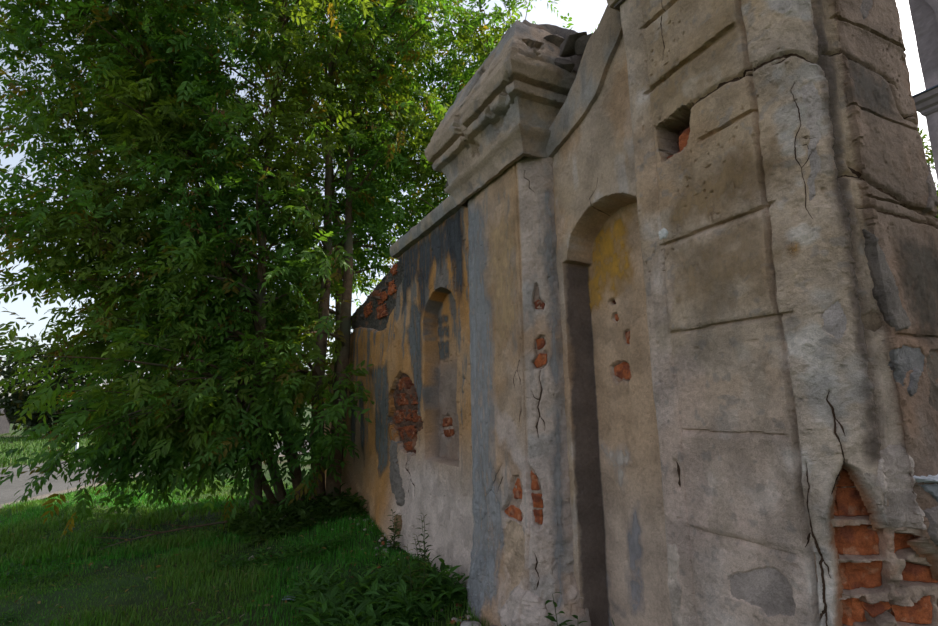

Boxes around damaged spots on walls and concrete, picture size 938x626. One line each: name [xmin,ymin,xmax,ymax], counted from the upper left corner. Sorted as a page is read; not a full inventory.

crack [695,52,894,104]
crack [791,84,816,219]
spalling [351,261,404,331]
spalling [533,286,545,310]
spalling [392,373,423,455]
crack [513,360,545,436]
spalling [534,337,547,369]
spalling [614,362,631,383]
crack [826,392,845,494]
spalling [504,467,543,525]
crack [805,464,831,626]
spalling [831,468,938,626]